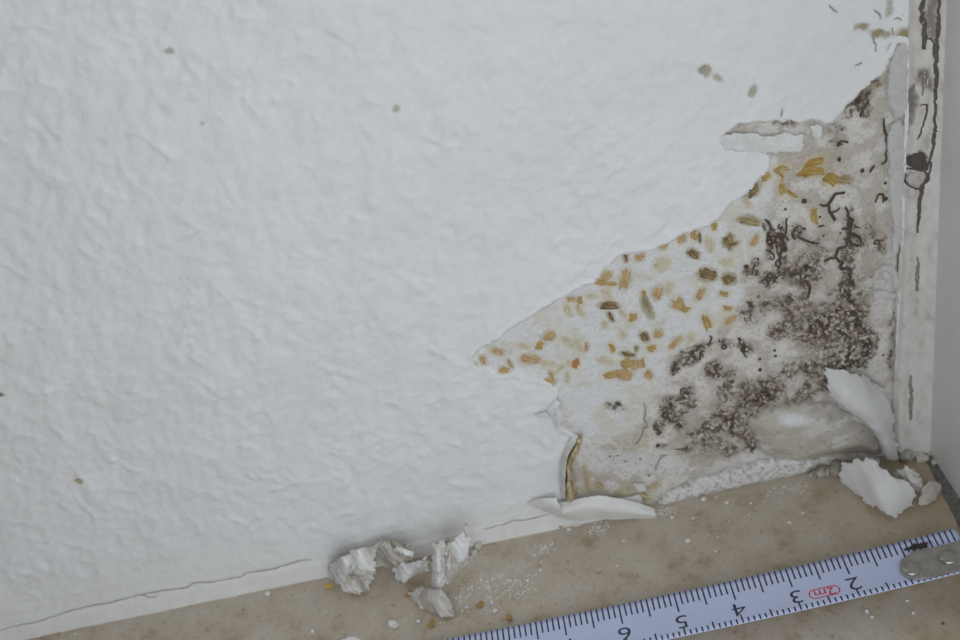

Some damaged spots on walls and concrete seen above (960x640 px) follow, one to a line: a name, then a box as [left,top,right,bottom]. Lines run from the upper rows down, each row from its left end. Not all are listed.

peeling [472,43,909,521]
damp [634,191,895,476]
damp [860,118,888,173]
crack [0,559,311,631]